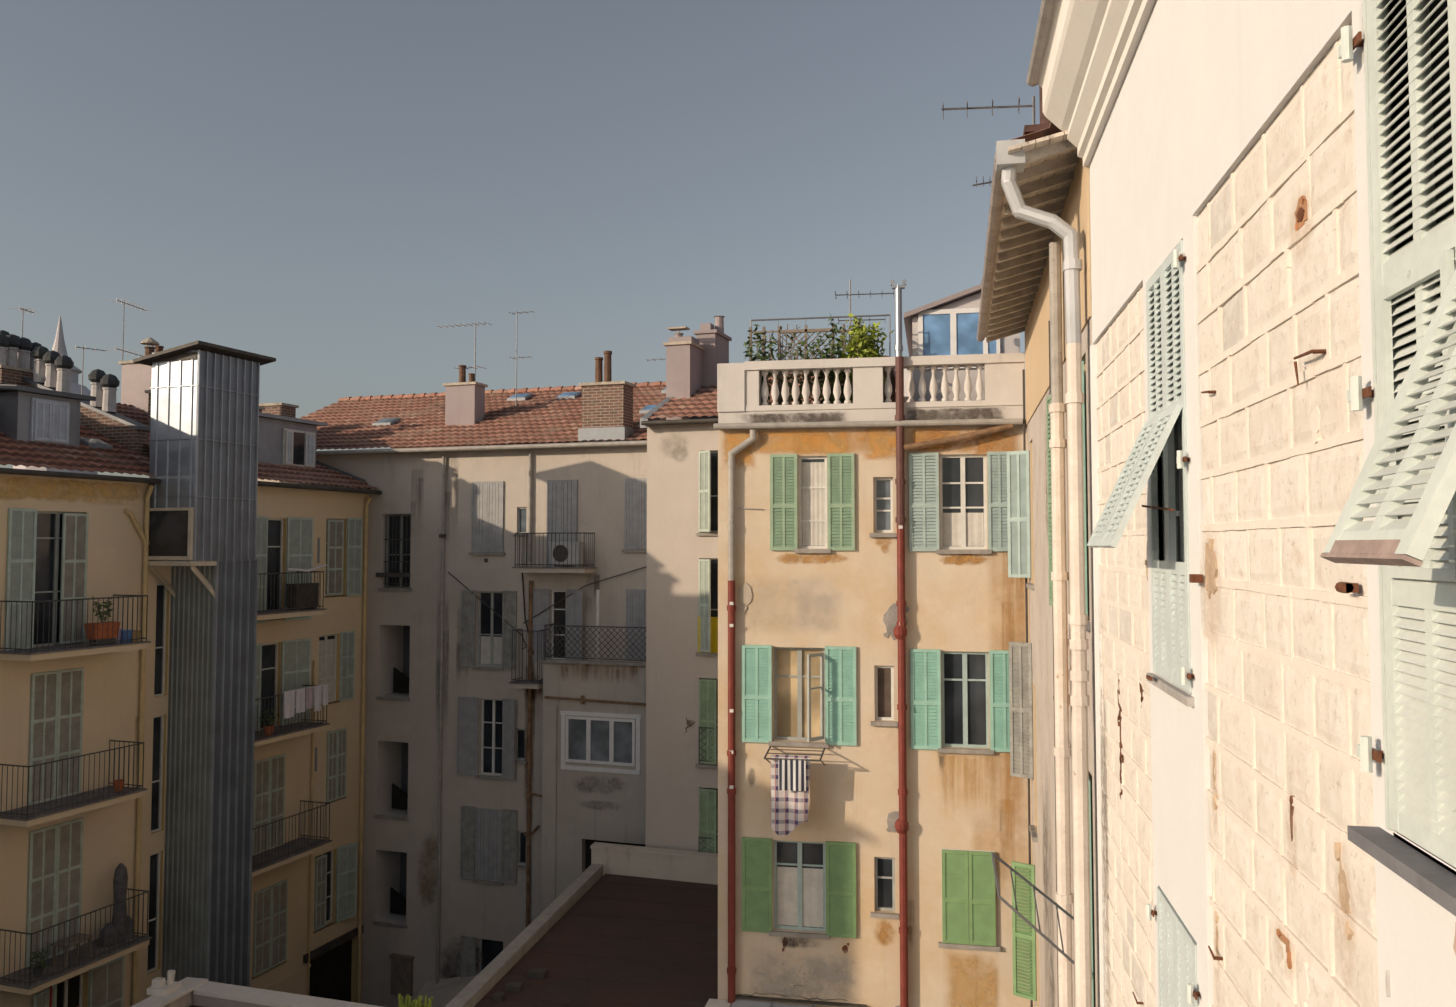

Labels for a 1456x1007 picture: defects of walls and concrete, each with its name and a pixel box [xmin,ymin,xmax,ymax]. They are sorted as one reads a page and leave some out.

corrosion [1276,929,1292,969]